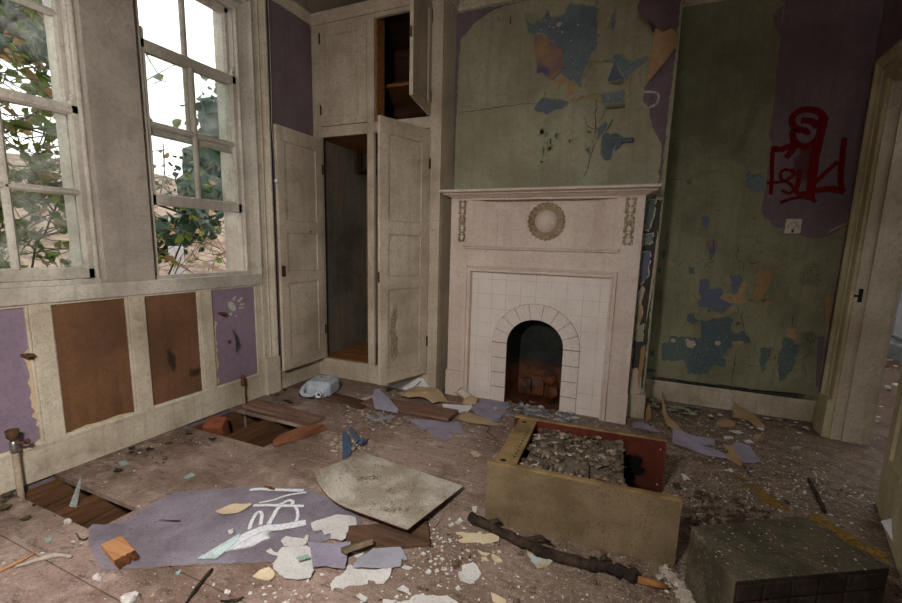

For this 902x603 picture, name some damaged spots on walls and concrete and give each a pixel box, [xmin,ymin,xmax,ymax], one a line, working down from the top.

peeling [524,0,650,116]
peeling [583,119,634,162]
peeling [628,195,811,395]